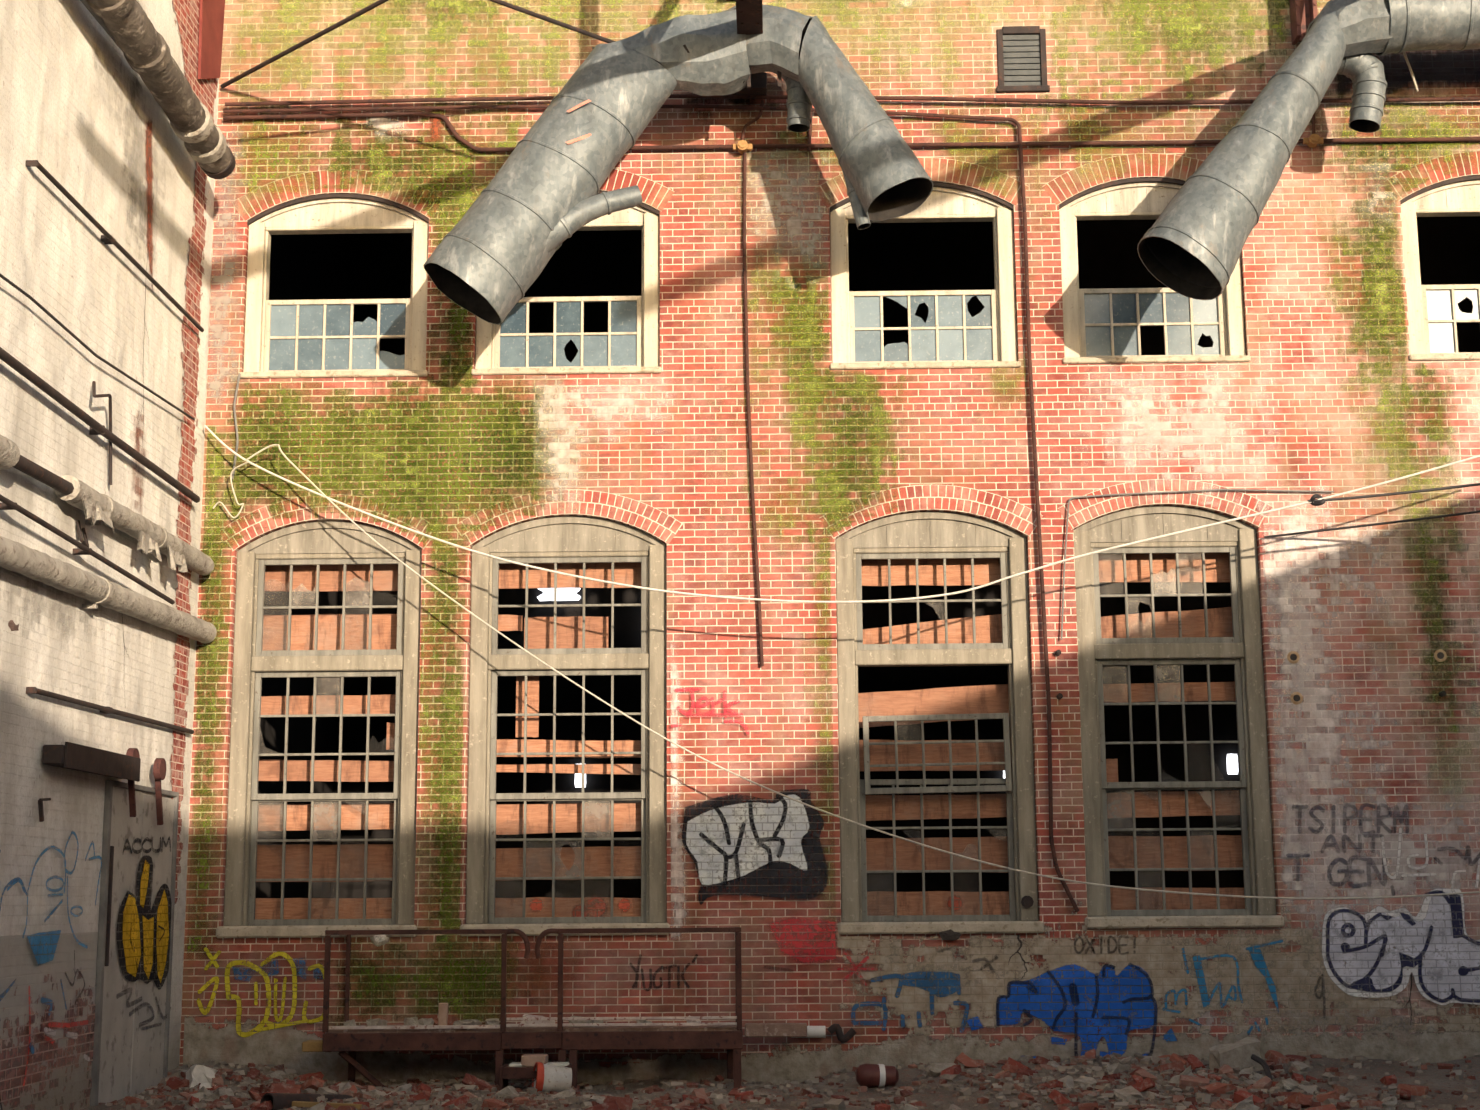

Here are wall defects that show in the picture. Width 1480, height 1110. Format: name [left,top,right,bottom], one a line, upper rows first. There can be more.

damp [1263,515,1473,922]
peeling [0,969,96,1110]